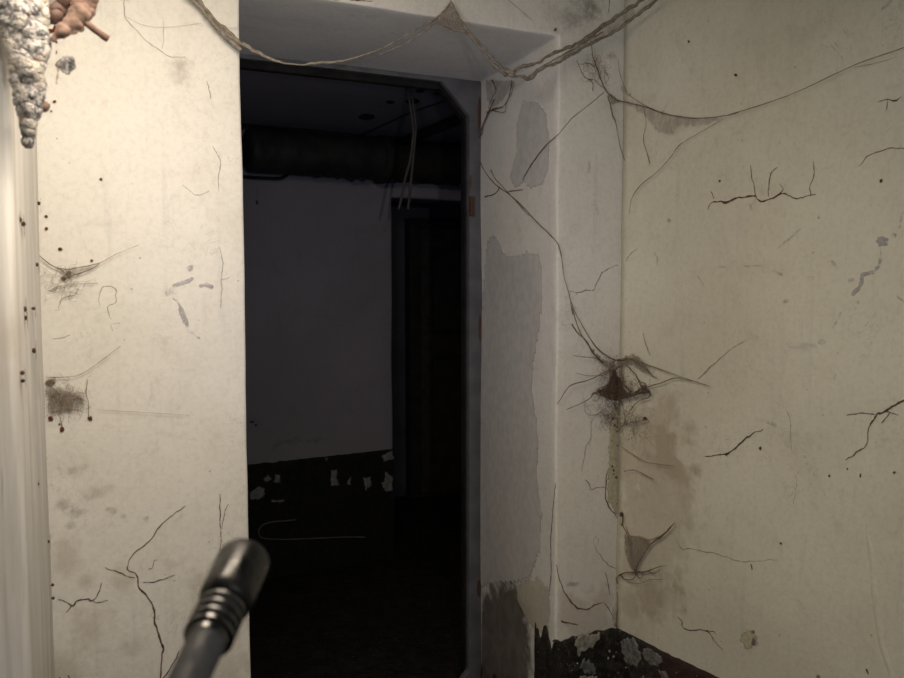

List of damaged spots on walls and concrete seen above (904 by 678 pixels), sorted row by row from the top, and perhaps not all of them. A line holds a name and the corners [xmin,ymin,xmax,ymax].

crack [708,161,816,209]
crack [705,429,763,457]
crack [846,400,904,460]
peeling [250,475,284,503]
peeling [363,451,394,492]
crack [58,506,185,678]
peeling [567,632,600,678]
peeling [607,637,677,678]